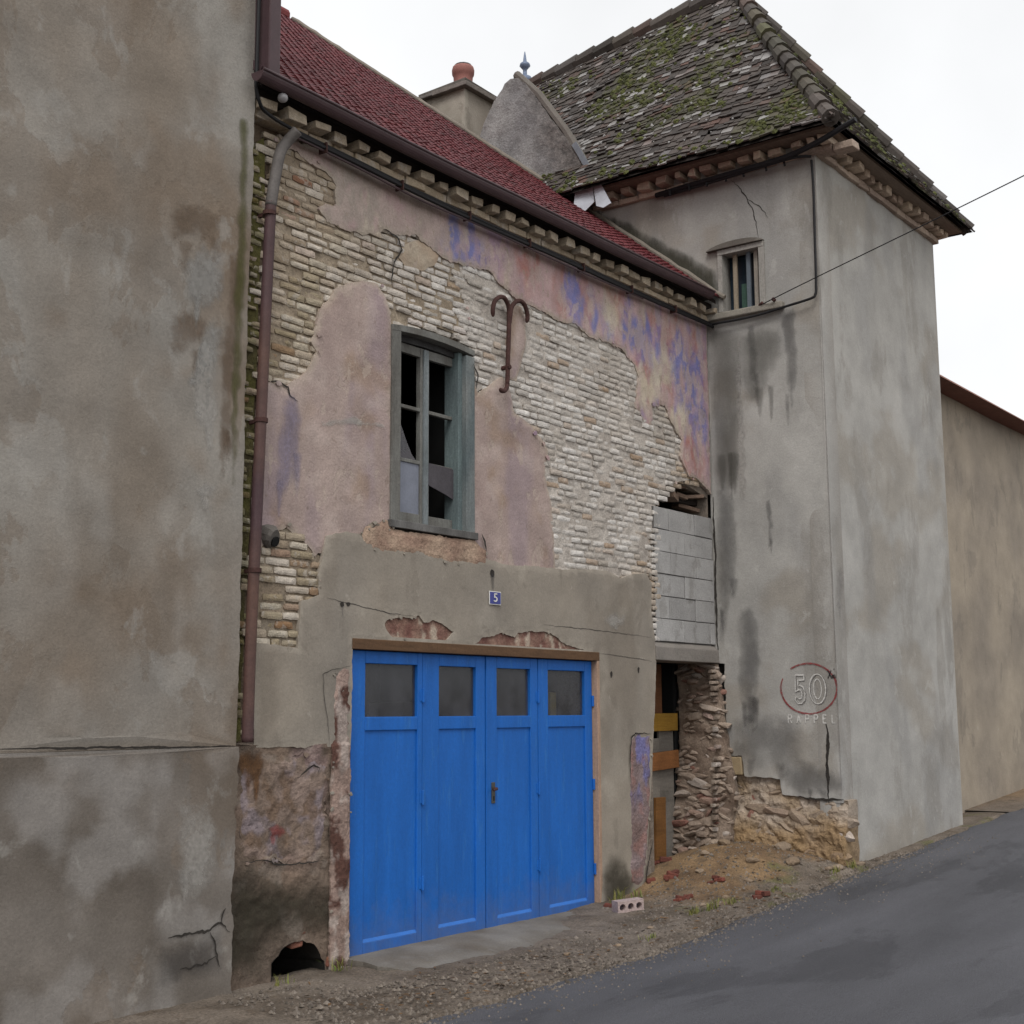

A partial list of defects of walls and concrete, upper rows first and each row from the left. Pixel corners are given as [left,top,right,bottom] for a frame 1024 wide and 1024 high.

crack [737,185,766,234]
peeling [236,131,704,742]
crack [799,724,842,803]
peeling [239,668,353,978]
crack [169,908,230,970]